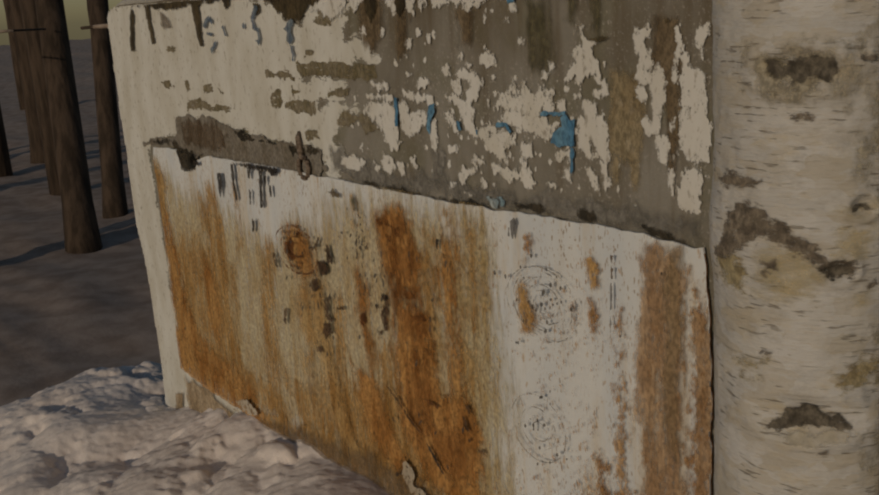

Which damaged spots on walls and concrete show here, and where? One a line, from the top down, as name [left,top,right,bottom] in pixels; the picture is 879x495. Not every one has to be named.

peeling [107,0,620,416]
corrosion [154,156,712,495]
peeling [632,20,713,215]